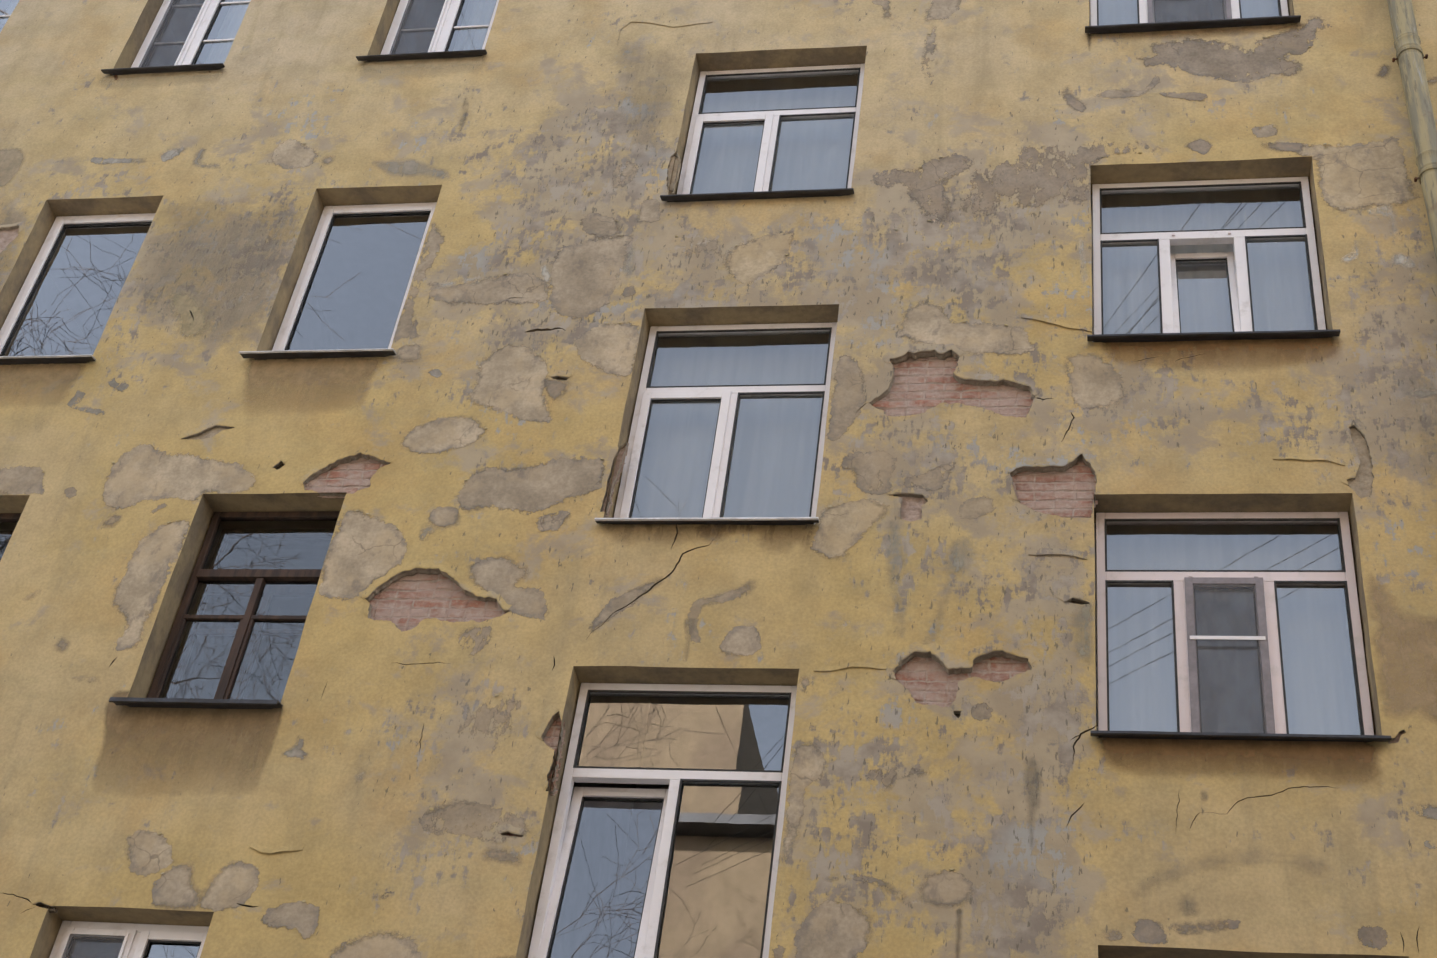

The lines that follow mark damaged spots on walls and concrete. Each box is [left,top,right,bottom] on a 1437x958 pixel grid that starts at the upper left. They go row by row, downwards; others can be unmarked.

peeling [1063,18,1332,112]
peeling [870,142,1148,230]
peeling [108,378,129,391]
spalling [826,300,1040,441]
peeling [102,418,256,651]
spalling [270,454,288,470]
spalling [298,322,640,656]
peeling [810,450,955,559]
spalling [958,446,1101,520]
crack [587,526,717,638]
spalling [885,640,1036,721]
crack [1176,786,1333,828]